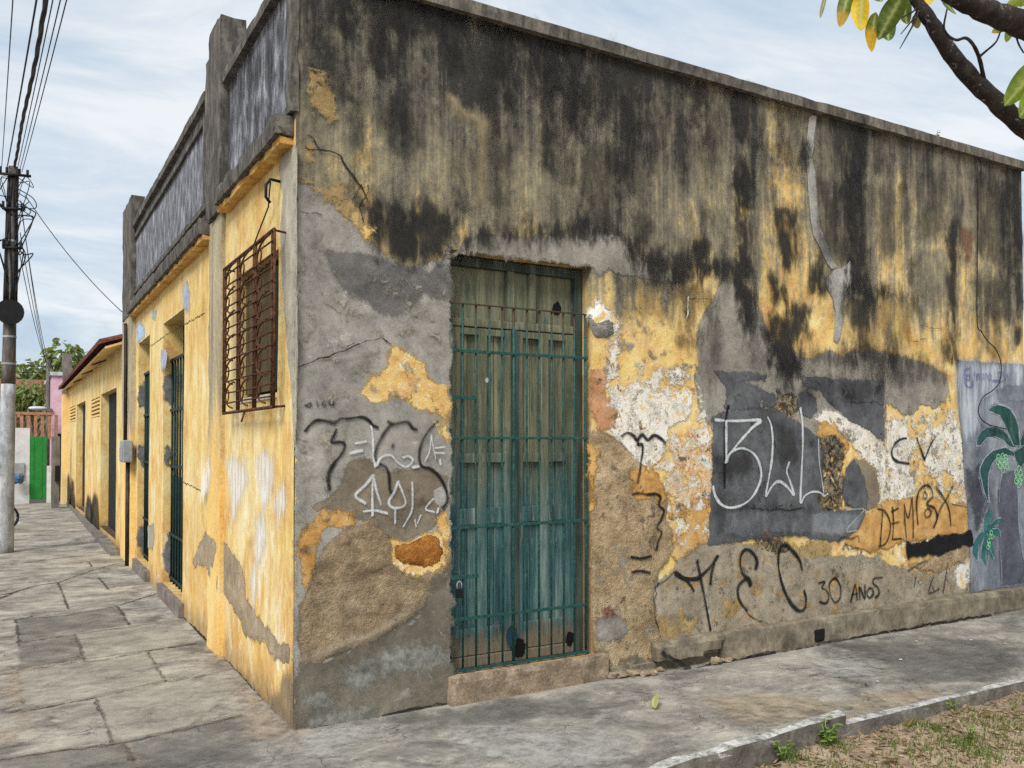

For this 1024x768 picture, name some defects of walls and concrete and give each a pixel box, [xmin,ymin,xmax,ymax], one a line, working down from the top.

water stain [307,68,338,124]
water stain [326,0,466,75]
water stain [498,27,592,170]
crack [305,134,369,223]
crack [297,338,391,368]
water stain [301,90,831,380]
water stain [844,131,885,304]
water stain [946,217,961,364]
water stain [1015,218,1024,346]
peeling [193,144,971,730]